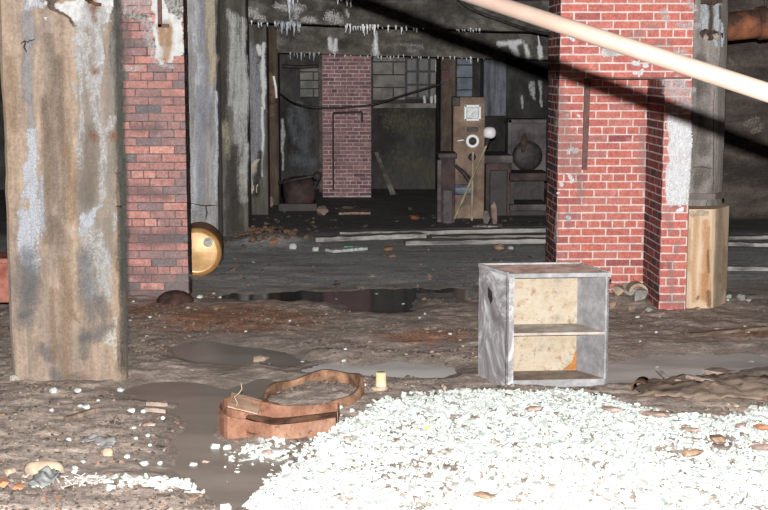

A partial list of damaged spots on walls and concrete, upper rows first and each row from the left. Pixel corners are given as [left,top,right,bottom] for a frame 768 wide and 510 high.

water stain [16,0,46,324]
water stain [70,0,178,370]
peeling [149,0,184,65]
water stain [191,0,484,234]
spalling [700,29,723,41]